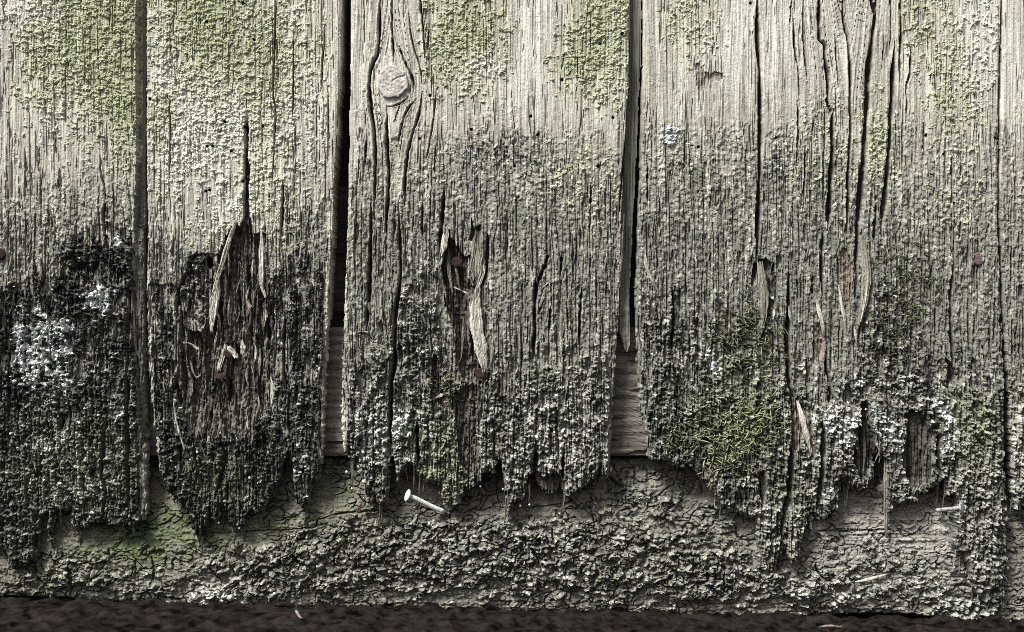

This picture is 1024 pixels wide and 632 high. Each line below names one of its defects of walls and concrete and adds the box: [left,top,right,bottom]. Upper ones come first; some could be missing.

crack [243,124,251,225]
water stain [445,129,547,186]
crack [783,0,910,411]
crack [531,455,594,564]
crack [780,448,792,533]